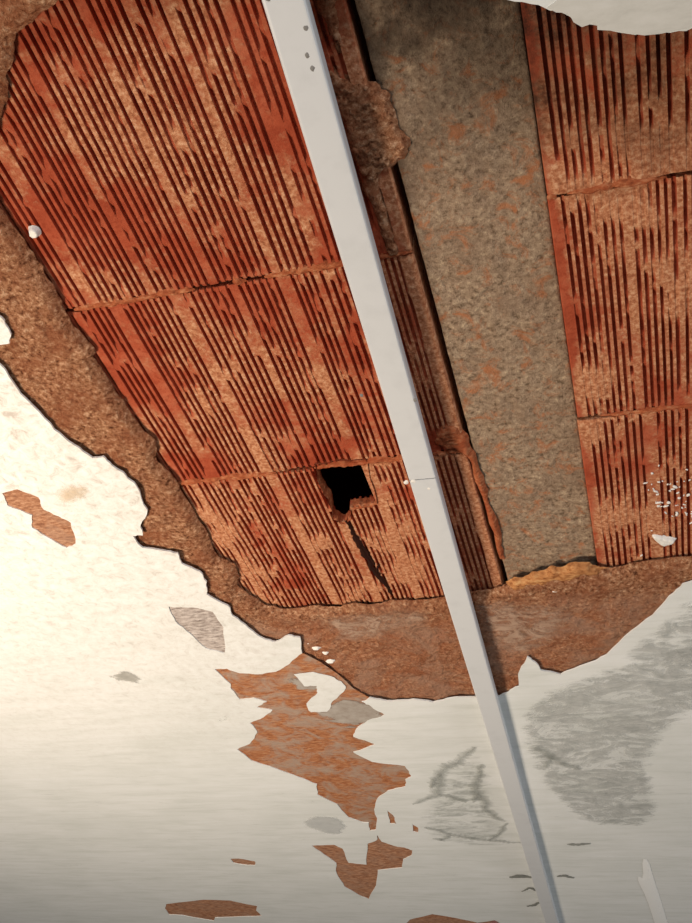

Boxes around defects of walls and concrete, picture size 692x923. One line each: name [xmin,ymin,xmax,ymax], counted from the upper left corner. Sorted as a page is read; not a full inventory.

flaking render [0,0,58,118]
peeling [547,0,692,35]
flaking render [0,208,476,899]
crack [345,520,393,595]
flaking render [470,556,692,695]
leakage [528,621,692,824]
peeling [165,900,261,920]